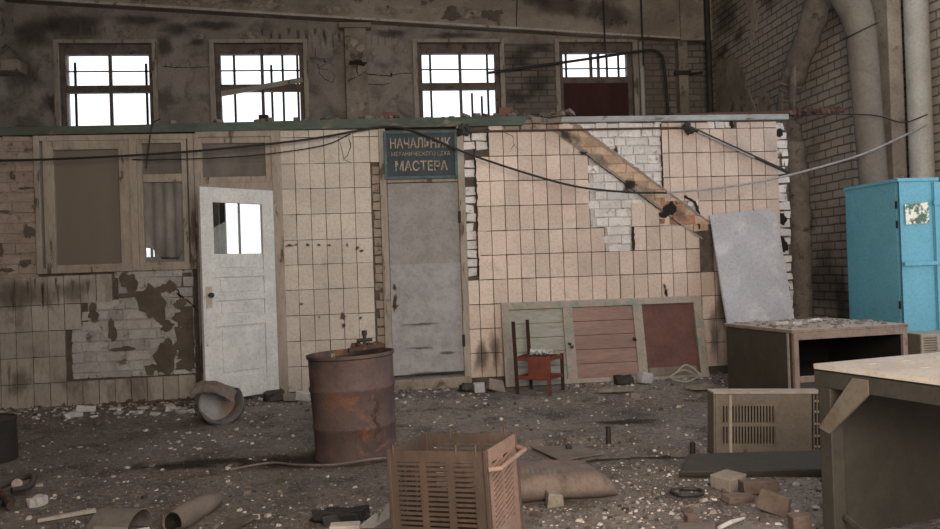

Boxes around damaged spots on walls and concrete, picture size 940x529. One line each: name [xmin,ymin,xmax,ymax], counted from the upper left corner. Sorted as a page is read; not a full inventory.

spalling [442,5,503,21]
flaking render [464,129,489,277]
flaking render [548,122,710,251]
flaking render [72,269,199,379]